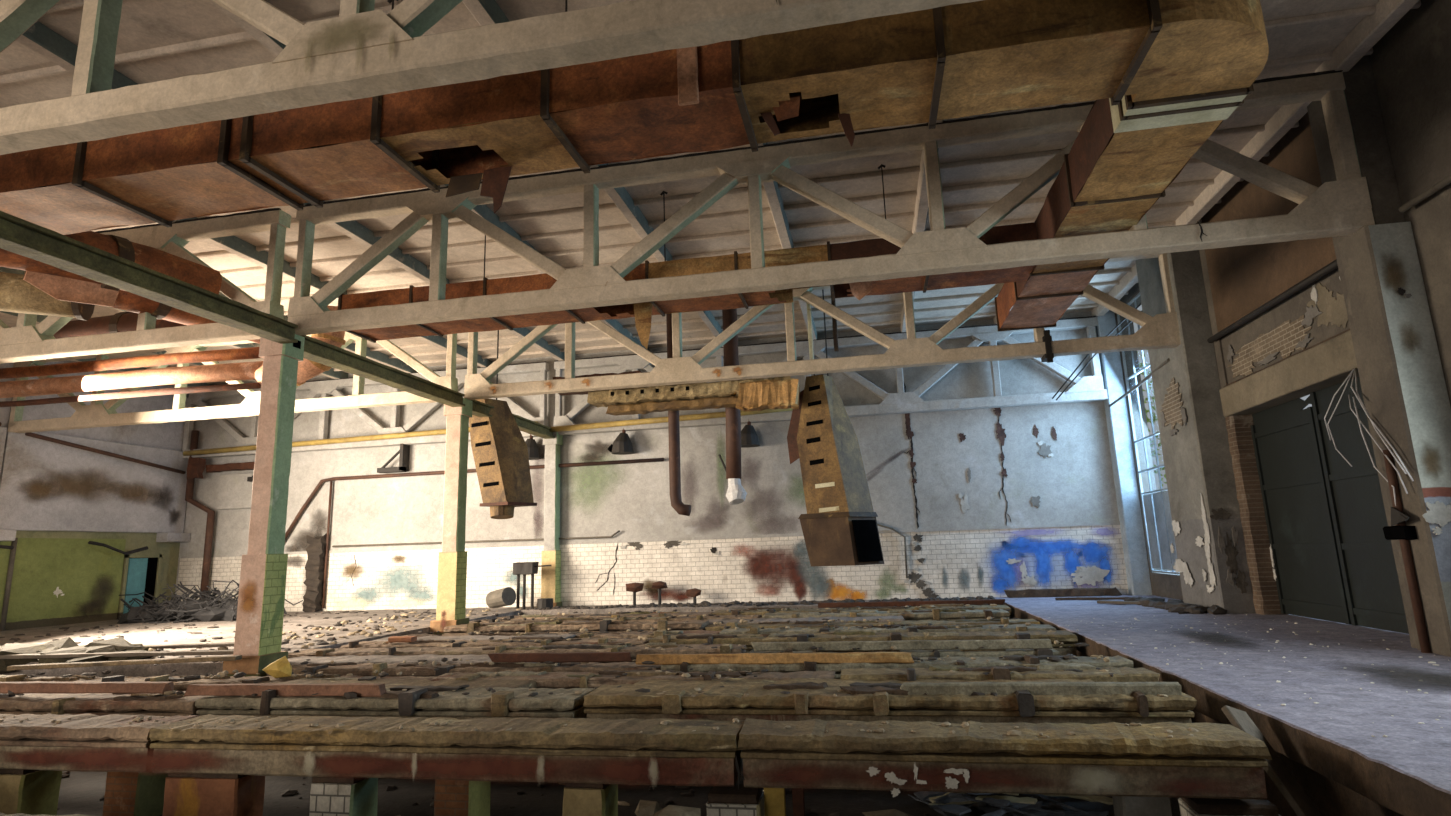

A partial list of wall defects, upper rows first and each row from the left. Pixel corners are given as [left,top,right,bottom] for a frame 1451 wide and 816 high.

flaking render [1227,276,1348,378]
water stain [25,474,153,501]
water stain [574,455,609,501]
spalling [1422,501,1451,535]
peeling [1170,492,1248,594]
corrosion [242,583,255,611]